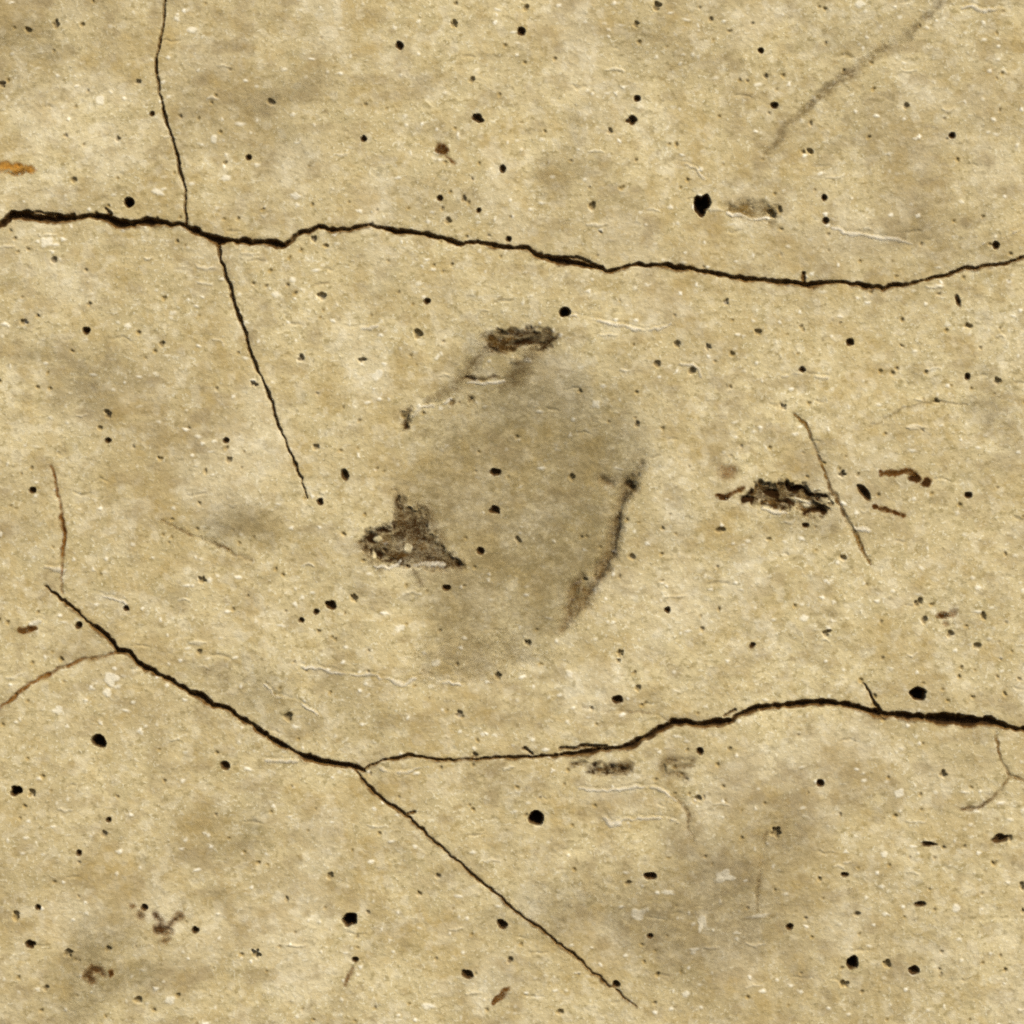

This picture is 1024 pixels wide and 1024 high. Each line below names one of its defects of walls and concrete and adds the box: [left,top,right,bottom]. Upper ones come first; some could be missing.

crack [0,0,1024,498]
spalling [456,326,557,385]
spalling [360,495,462,570]
spalling [741,480,829,516]
crack [794,414,870,564]
crack [1,466,1024,1007]